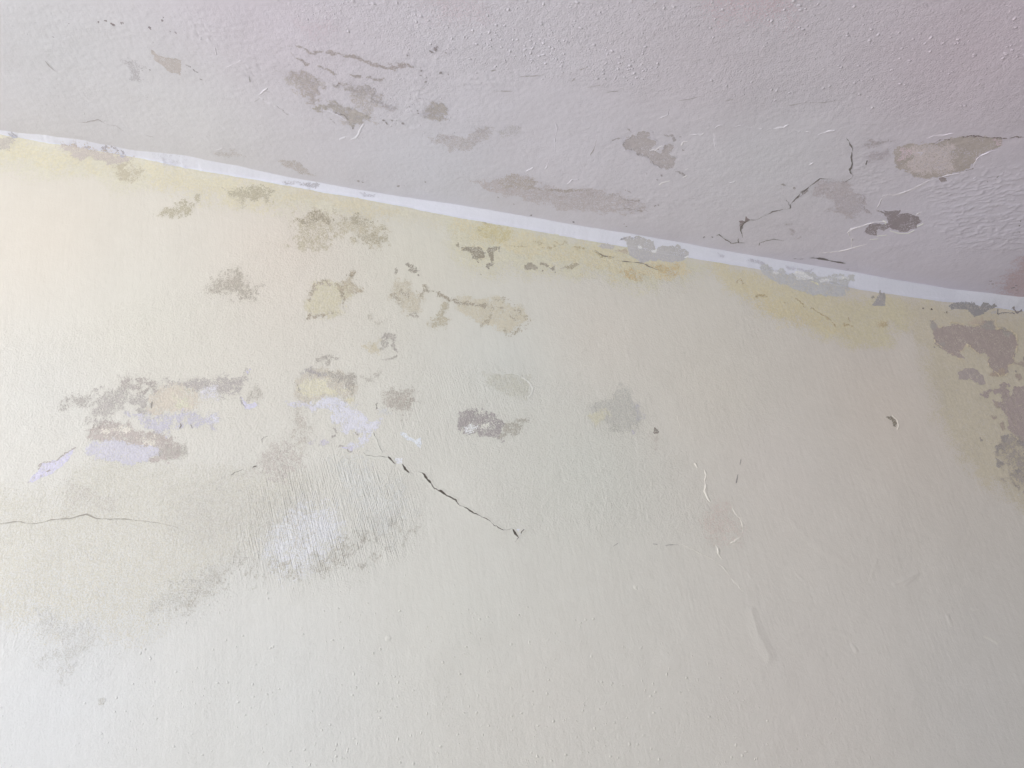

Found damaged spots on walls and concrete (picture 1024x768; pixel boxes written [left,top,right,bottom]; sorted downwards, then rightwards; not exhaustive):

peeling [284,45,427,140]
peeling [612,125,724,185]
crack [718,138,867,245]
peeling [825,133,1024,257]
crack [1,514,175,527]
peeling [28,420,188,483]
peeling [285,396,392,453]
crack [362,431,526,543]
peeling [457,408,530,443]
peeling [929,302,1024,493]